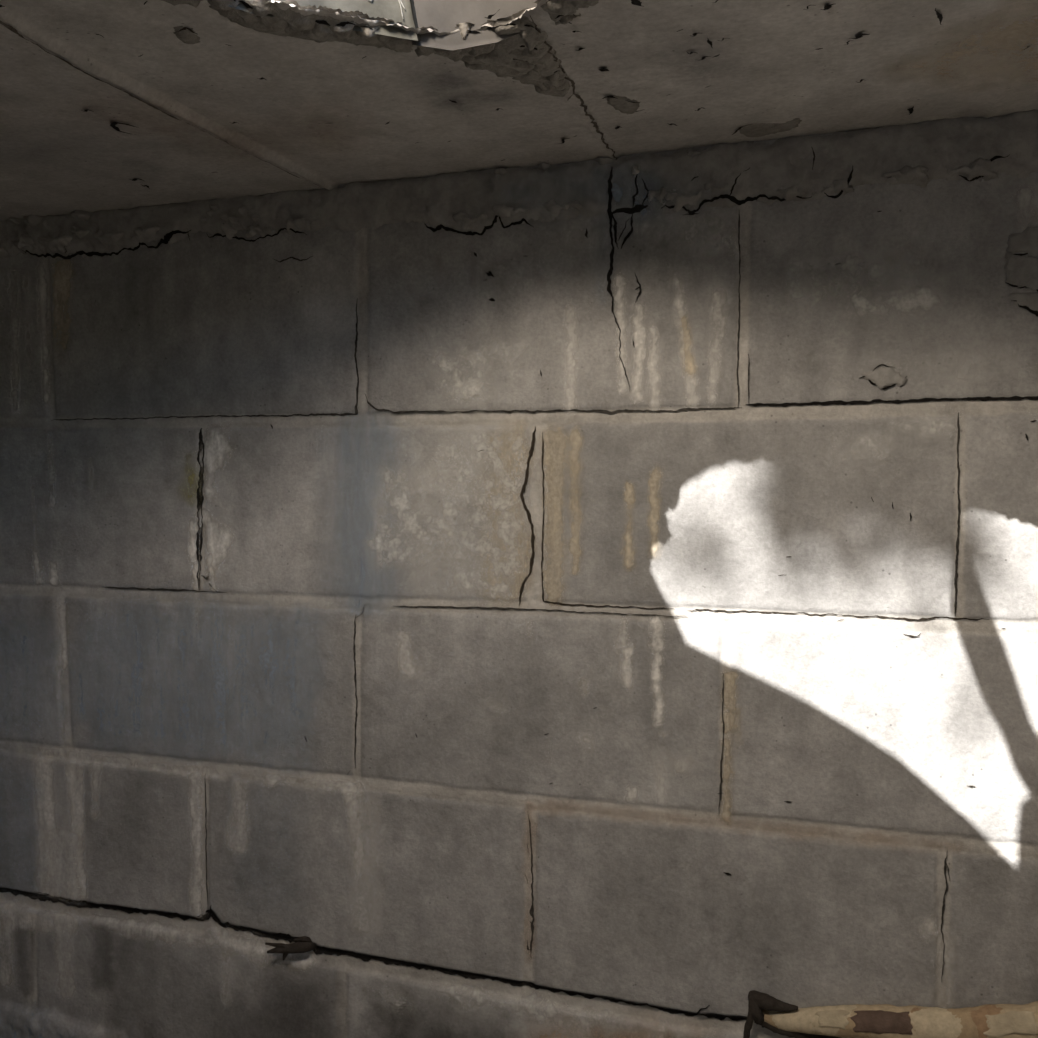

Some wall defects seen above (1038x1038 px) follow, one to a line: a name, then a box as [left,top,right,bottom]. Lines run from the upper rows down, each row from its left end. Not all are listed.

spalling [161,0,599,97]
crack [22,16,1038,637]
water stain [616,276,660,411]
water stain [675,281,698,407]
water stain [199,431,230,496]
water stain [188,510,232,592]
crack [348,603,366,773]
crack [718,674,726,807]